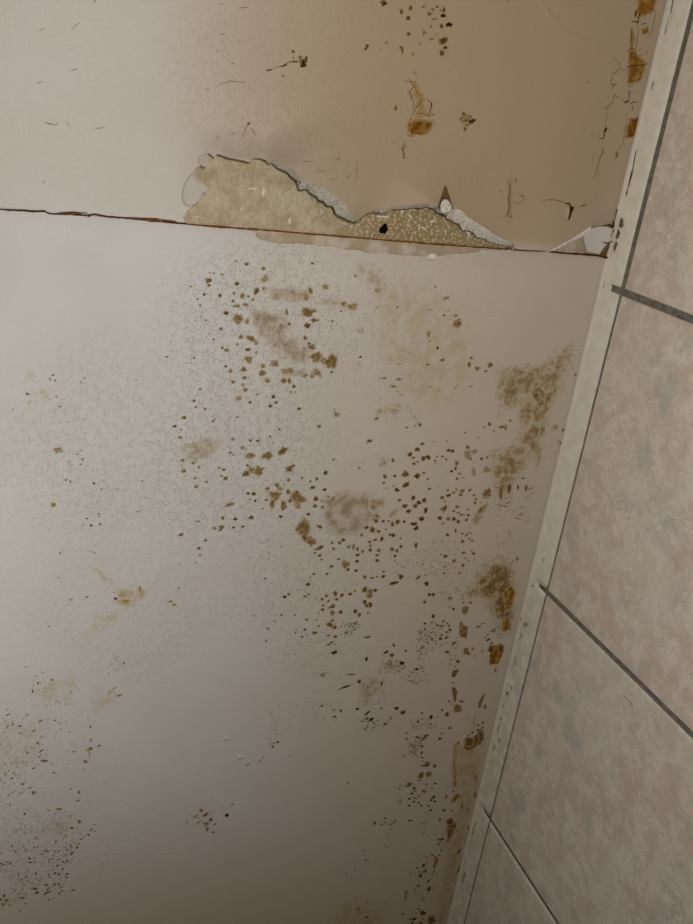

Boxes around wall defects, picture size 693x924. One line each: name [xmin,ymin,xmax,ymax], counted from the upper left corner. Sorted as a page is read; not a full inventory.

damp [399,5,453,57]
damp [458,112,476,132]
peeling [185,153,624,259]
damp [172,259,577,815]
damp [78,564,149,646]